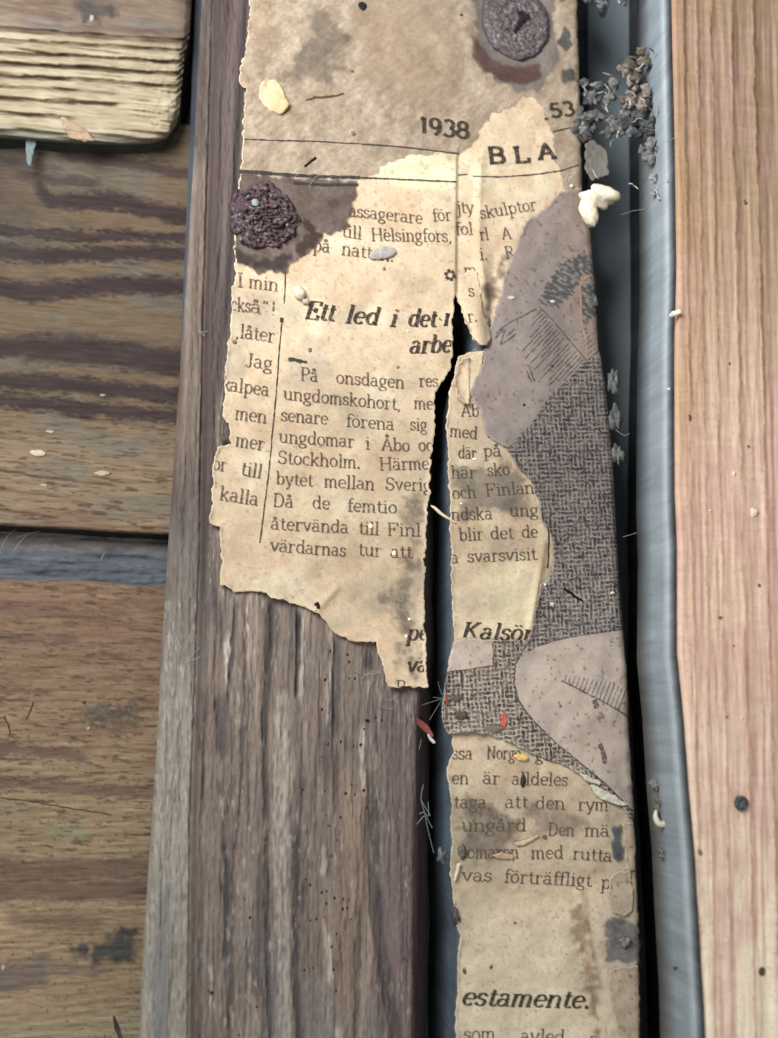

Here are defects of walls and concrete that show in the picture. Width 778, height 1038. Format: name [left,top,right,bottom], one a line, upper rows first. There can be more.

damp [574,905,589,951]